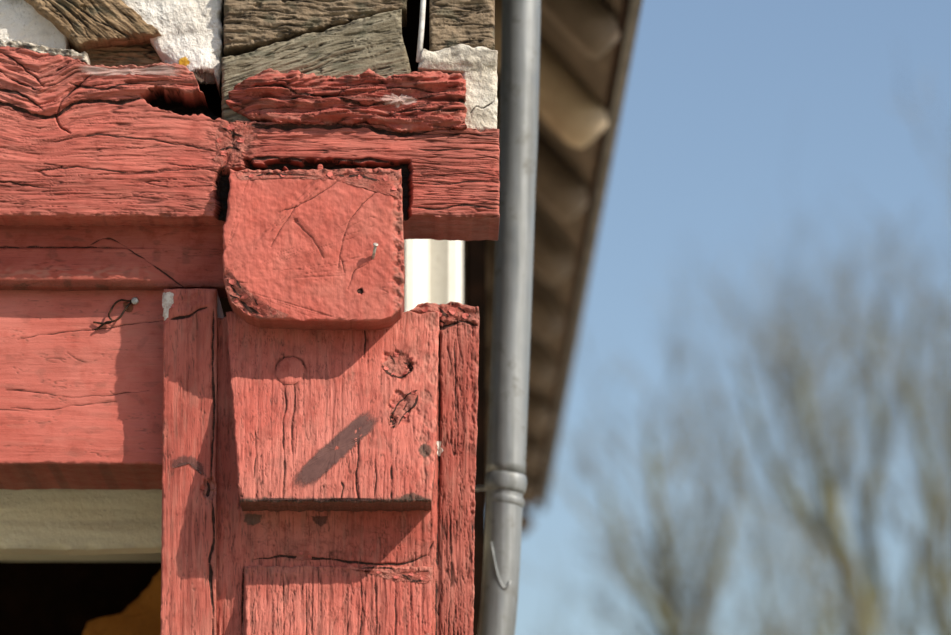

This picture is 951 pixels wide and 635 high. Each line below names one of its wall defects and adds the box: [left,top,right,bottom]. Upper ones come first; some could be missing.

crack [0,52,496,287]
crack [0,390,149,411]
crack [23,307,215,477]
crack [207,503,215,635]
crack [254,512,452,635]